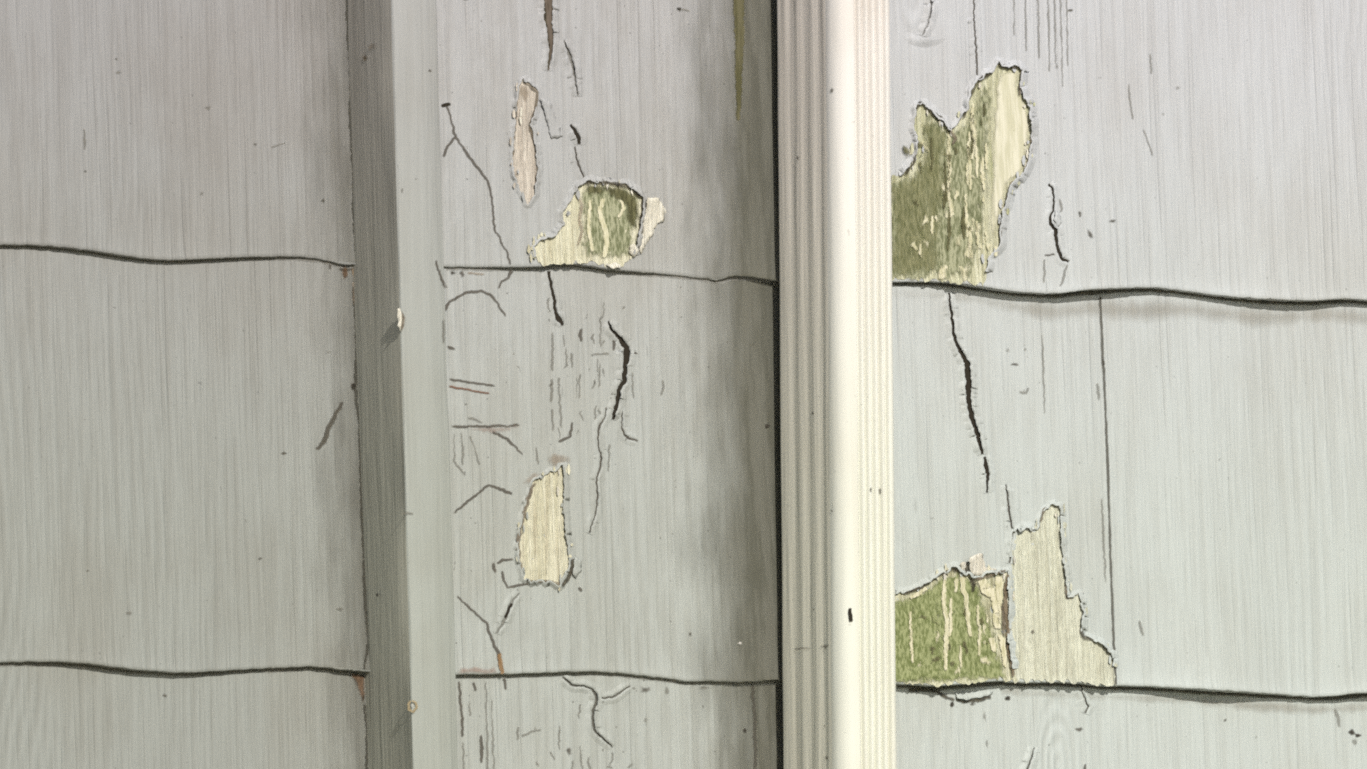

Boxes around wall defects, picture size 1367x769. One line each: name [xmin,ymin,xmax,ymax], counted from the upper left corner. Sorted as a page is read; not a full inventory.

peeling [508,75,563,209]
crack [436,103,640,536]
peeling [527,175,666,269]
peeling [891,56,1040,286]
crack [941,292,1036,564]
peeling [491,462,582,636]
peeling [895,499,1119,707]